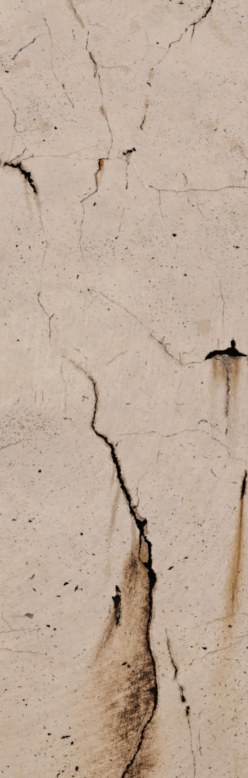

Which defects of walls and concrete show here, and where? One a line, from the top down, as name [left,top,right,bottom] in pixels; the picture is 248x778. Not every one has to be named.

crack [0,0,136,257]
crack [139,0,214,130]
crack [150,145,248,260]
corrosion [50,530,191,778]
crack [37,215,248,778]
corrosion [209,496,248,740]